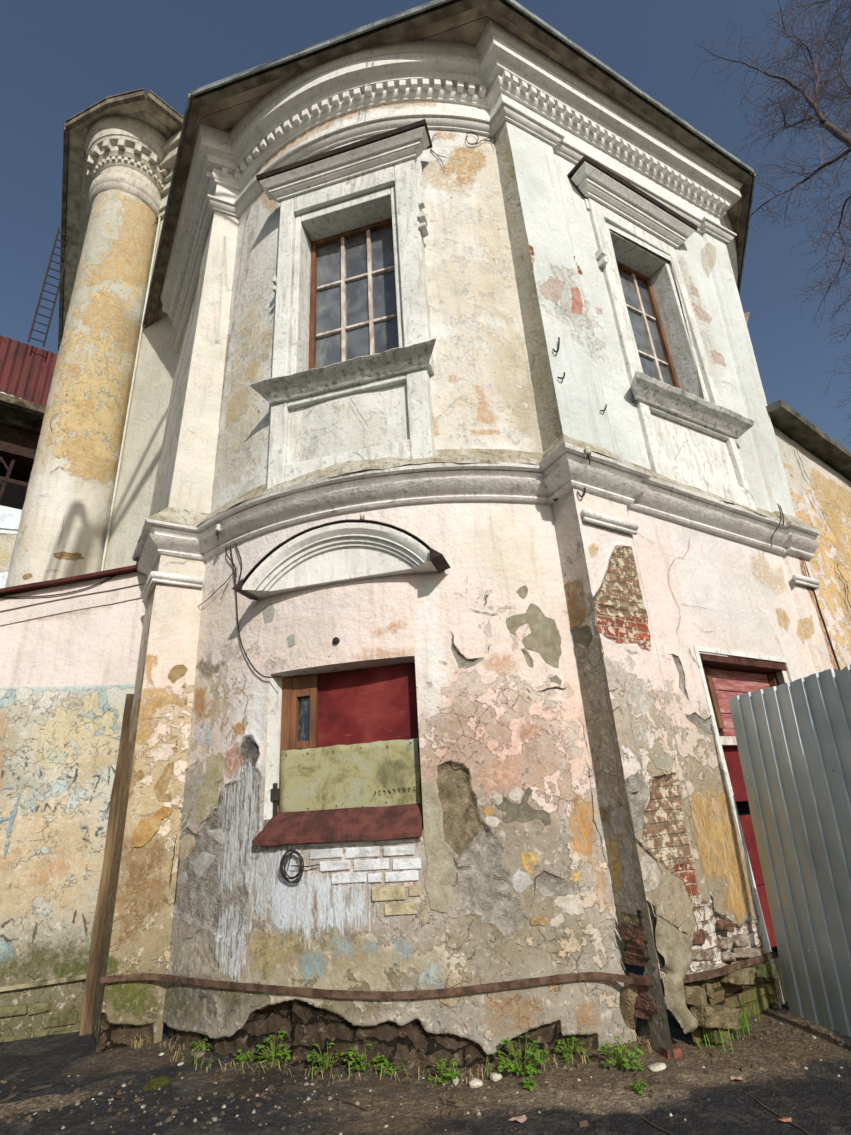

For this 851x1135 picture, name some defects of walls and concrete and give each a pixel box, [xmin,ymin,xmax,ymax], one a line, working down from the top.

peeling [541,279,583,314]
flaking render [506,545,652,747]
flaking render [173,737,263,981]
flaking render [437,762,584,937]
crack [600,680,676,873]
crack [639,902,688,934]
flaking render [592,753,765,974]
flaking render [96,999,599,1071]